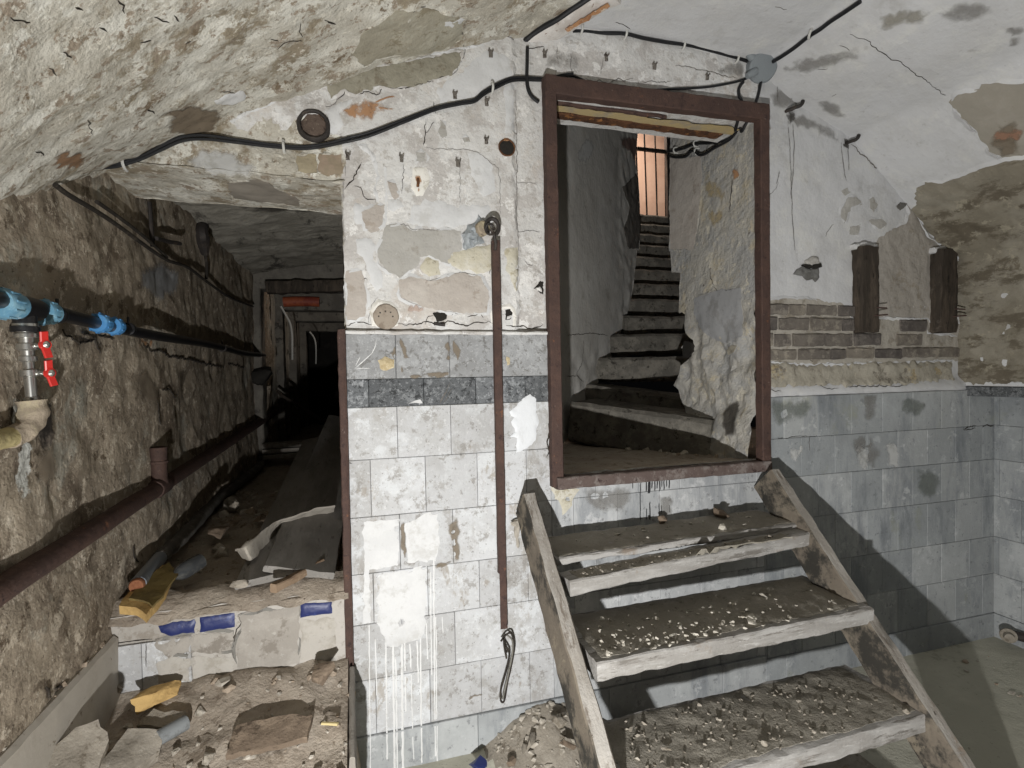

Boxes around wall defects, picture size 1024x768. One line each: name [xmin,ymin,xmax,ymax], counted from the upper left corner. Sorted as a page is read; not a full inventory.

crack [75,0,125,32]
crack [271,20,336,50]
flaking render [327,5,516,134]
crack [842,34,944,95]
corrosion [344,96,394,119]
flaking render [438,120,447,138]
flaking render [343,133,496,324]
flaking render [770,78,1024,385]
crack [62,329,113,353]
crack [143,345,244,369]
spalling [682,341,695,358]
flaking render [154,605,337,670]